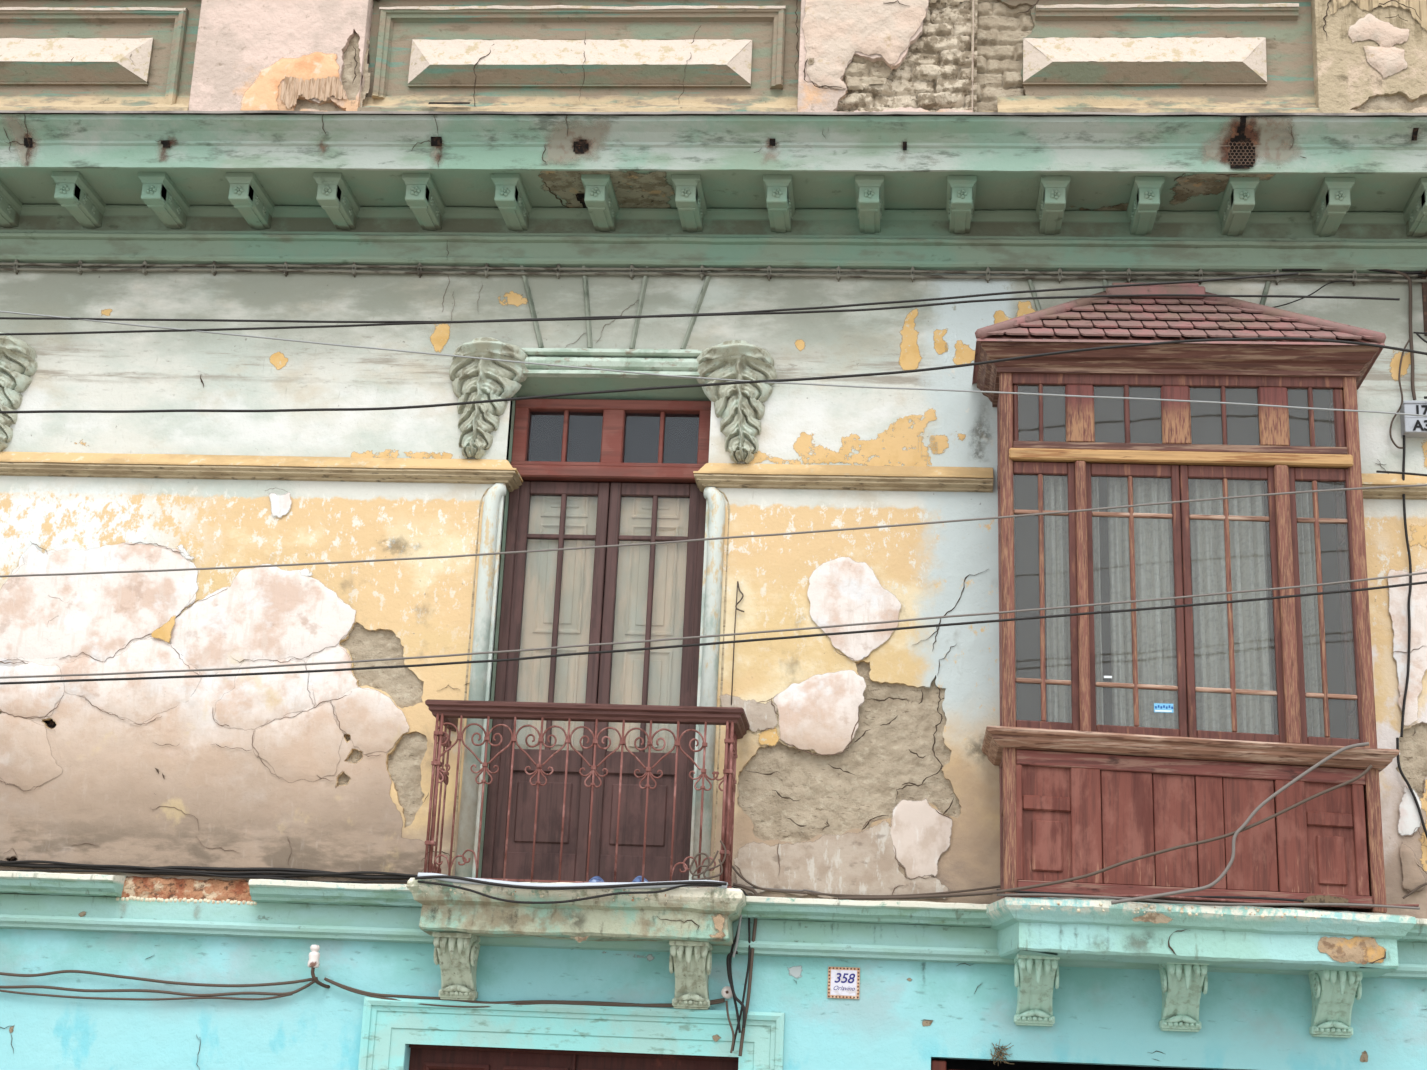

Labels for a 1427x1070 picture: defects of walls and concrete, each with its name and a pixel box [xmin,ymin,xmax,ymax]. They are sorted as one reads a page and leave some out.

peeling [240,52,347,111]
peeling [802,0,929,89]
peeling [1329,0,1427,78]
spalling [538,171,675,208]
peeling [745,408,966,467]
peeling [719,557,901,754]
crack [914,569,988,675]
peeling [1387,568,1427,726]
peeling [0,543,428,906]
peeling [733,799,952,900]
peeling [1398,779,1427,892]
spalling [1318,936,1386,964]